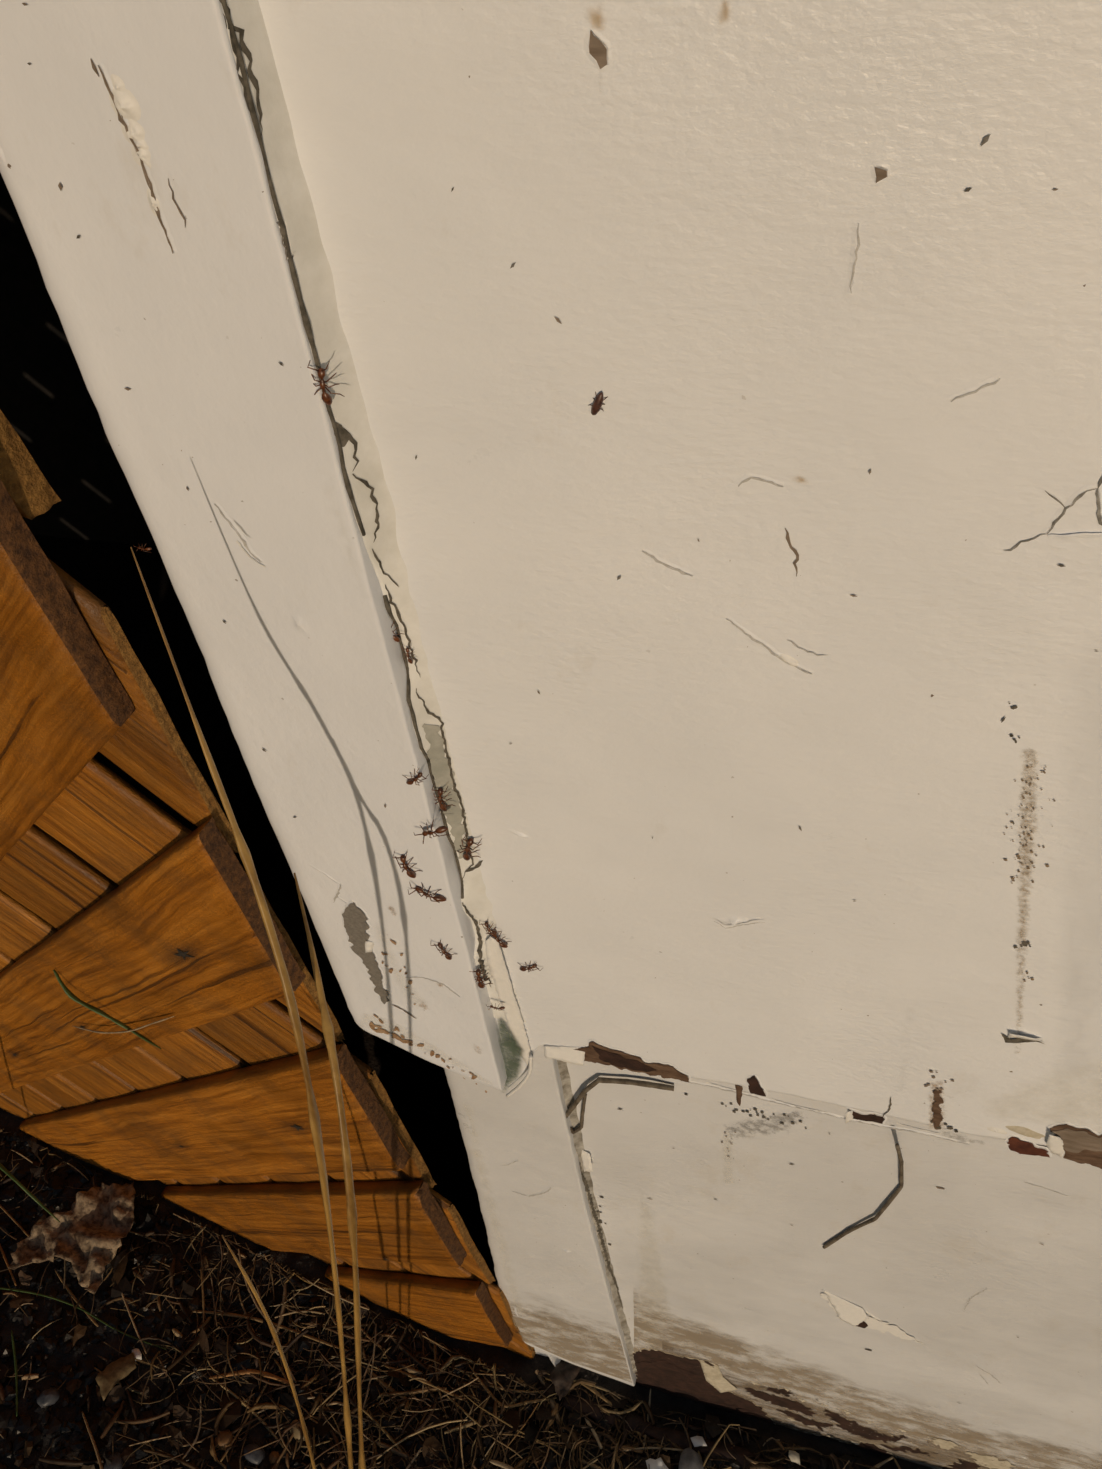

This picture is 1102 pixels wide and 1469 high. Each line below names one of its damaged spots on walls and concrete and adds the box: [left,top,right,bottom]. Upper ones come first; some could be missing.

crack [214,0,491,997]
crack [1004,477,1102,551]
peeling [310,864,416,1019]
peeling [485,936,691,1098]
peeling [987,1121,1102,1169]
peeling [820,1289,924,1345]